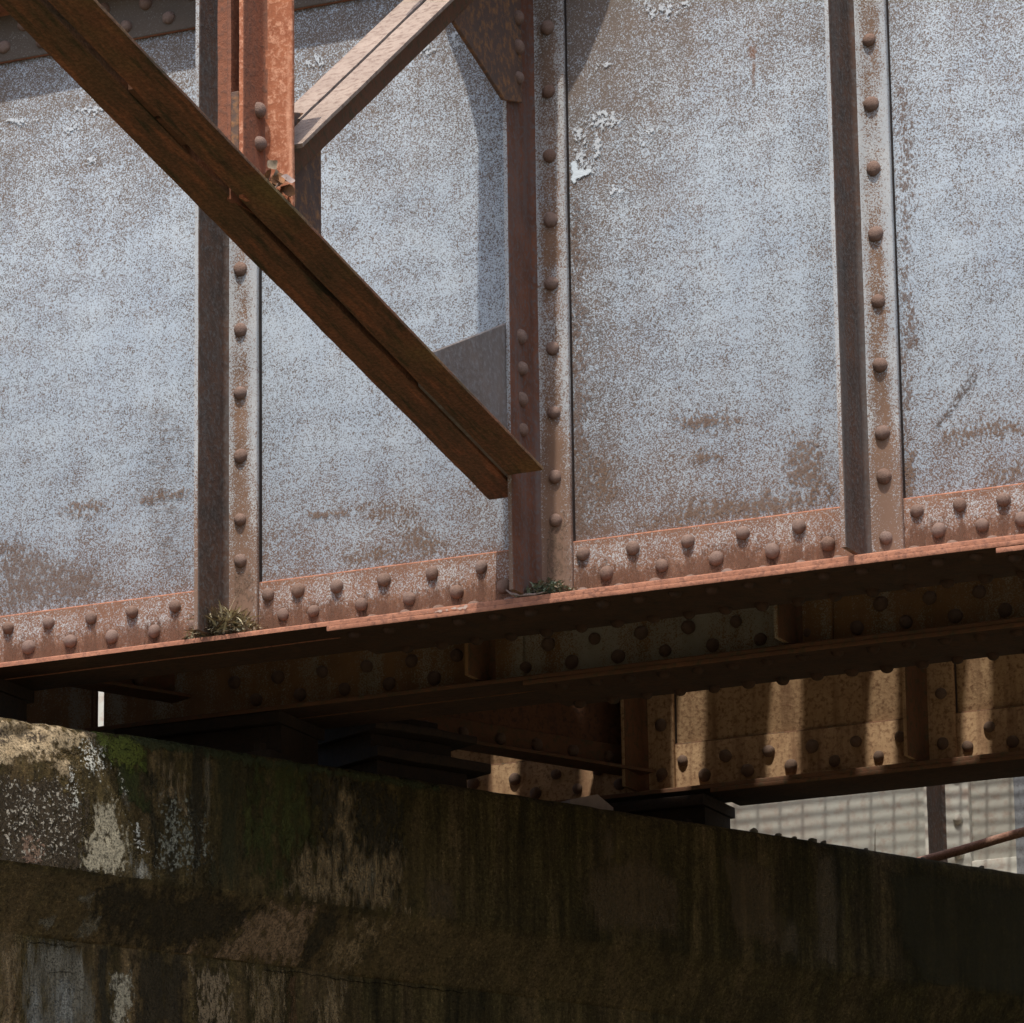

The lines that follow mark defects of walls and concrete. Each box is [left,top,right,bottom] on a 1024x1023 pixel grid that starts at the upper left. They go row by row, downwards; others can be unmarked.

peeling [570,105,627,183]
rust [547,181,840,589]
rust [57,495,113,523]
rust [132,487,189,505]
rust [306,496,450,570]
rust [0,530,125,614]
rust [234,569,511,630]
rust [0,614,198,662]
damp [0,745,411,1023]